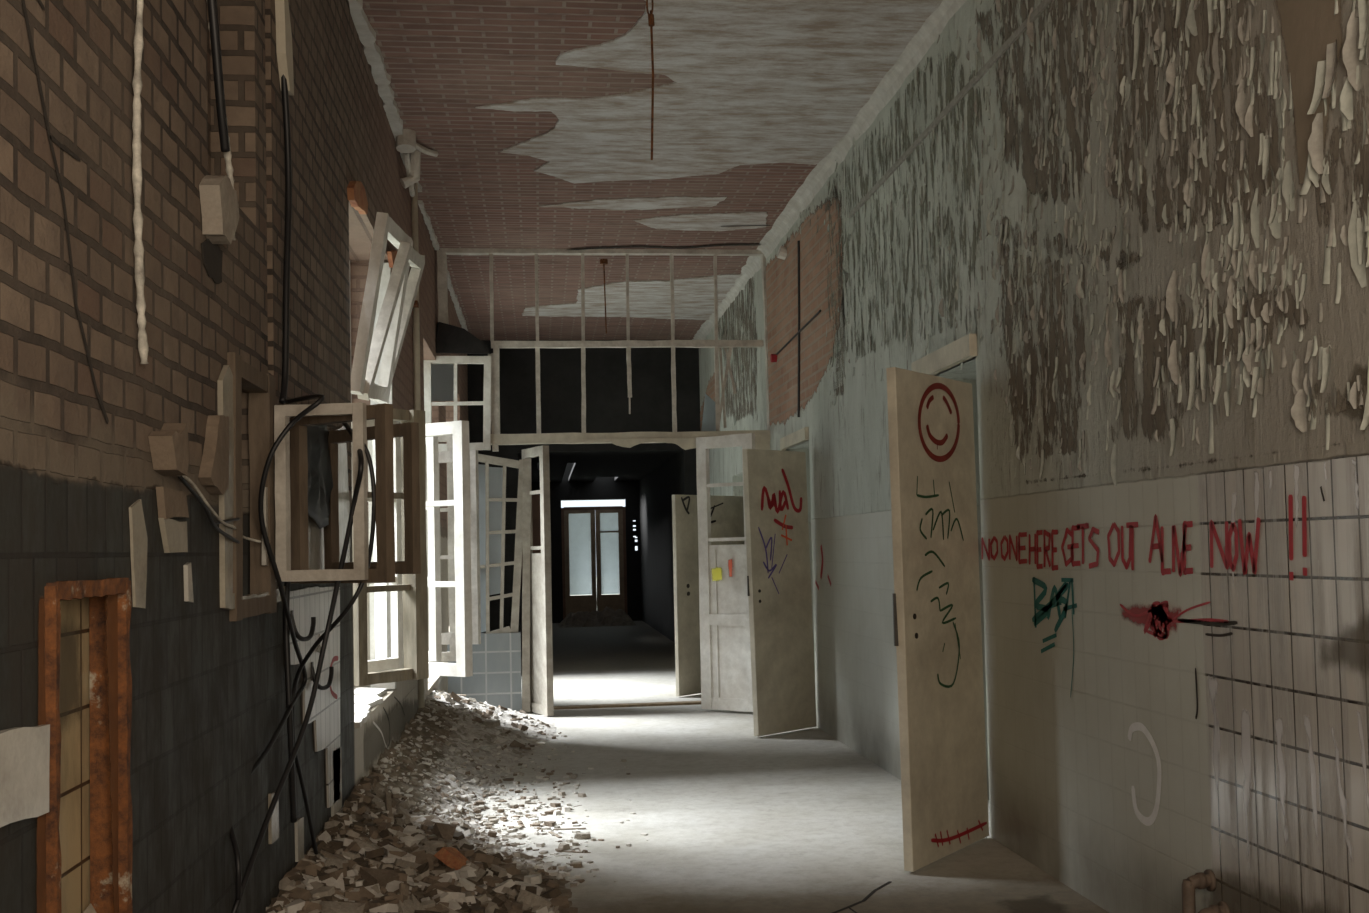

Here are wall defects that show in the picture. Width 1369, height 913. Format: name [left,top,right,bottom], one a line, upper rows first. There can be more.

spalling [347,181,368,214]
peeling [475,0,1369,486]